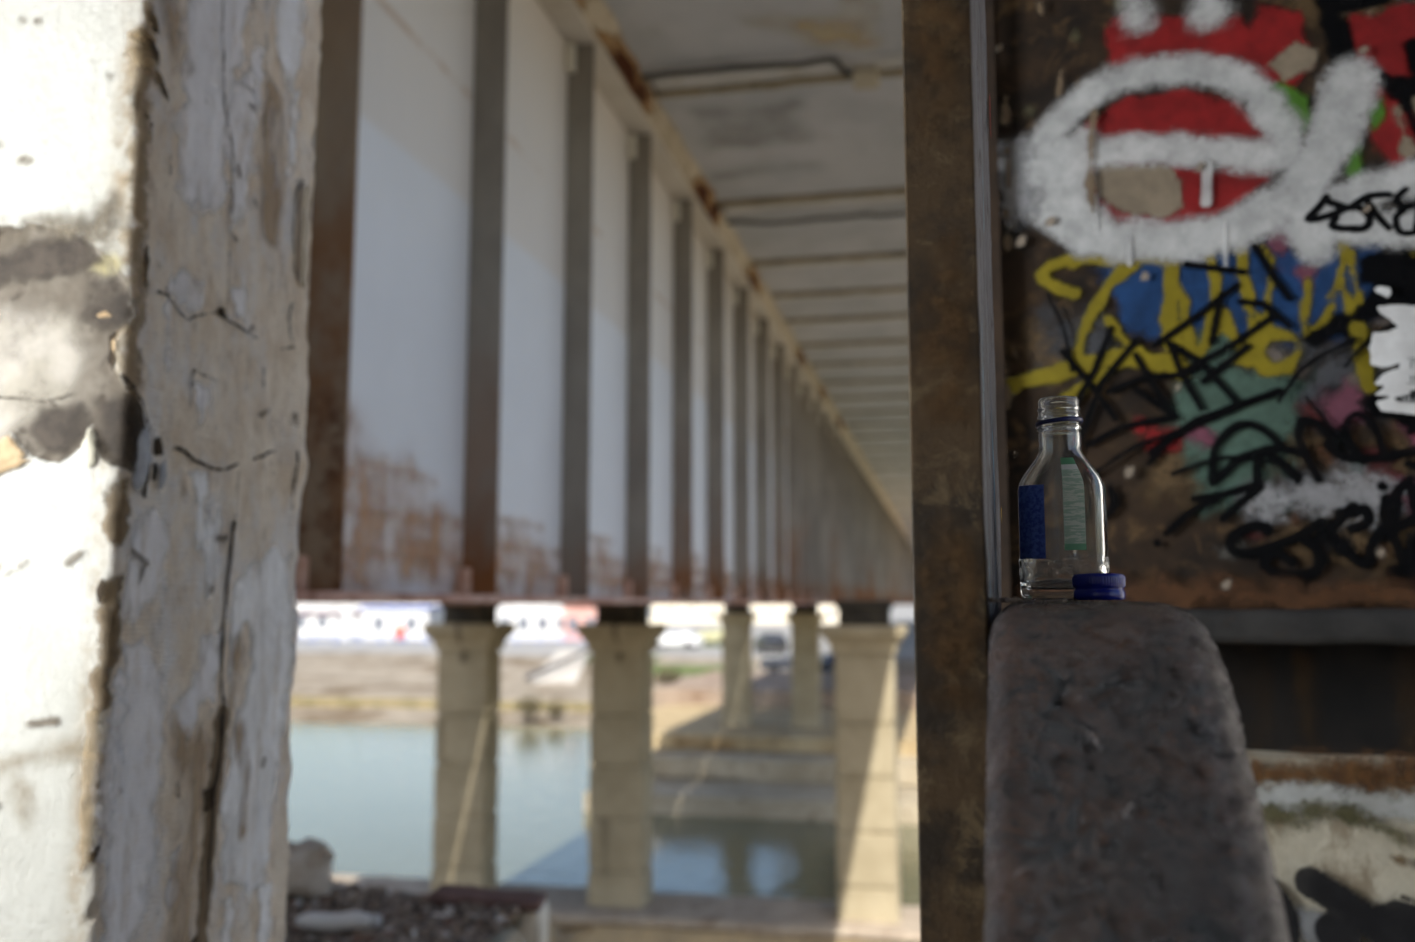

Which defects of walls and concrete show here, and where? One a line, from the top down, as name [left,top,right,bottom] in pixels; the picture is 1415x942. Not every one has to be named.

corrosion [575,0,653,115]
water stain [22,199,115,245]
flaking render [300,186,311,288]
corrosion [689,175,720,231]
spalling [0,0,305,942]
crack [120,374,299,527]
corrosion [343,465,386,591]
crack [205,520,236,921]